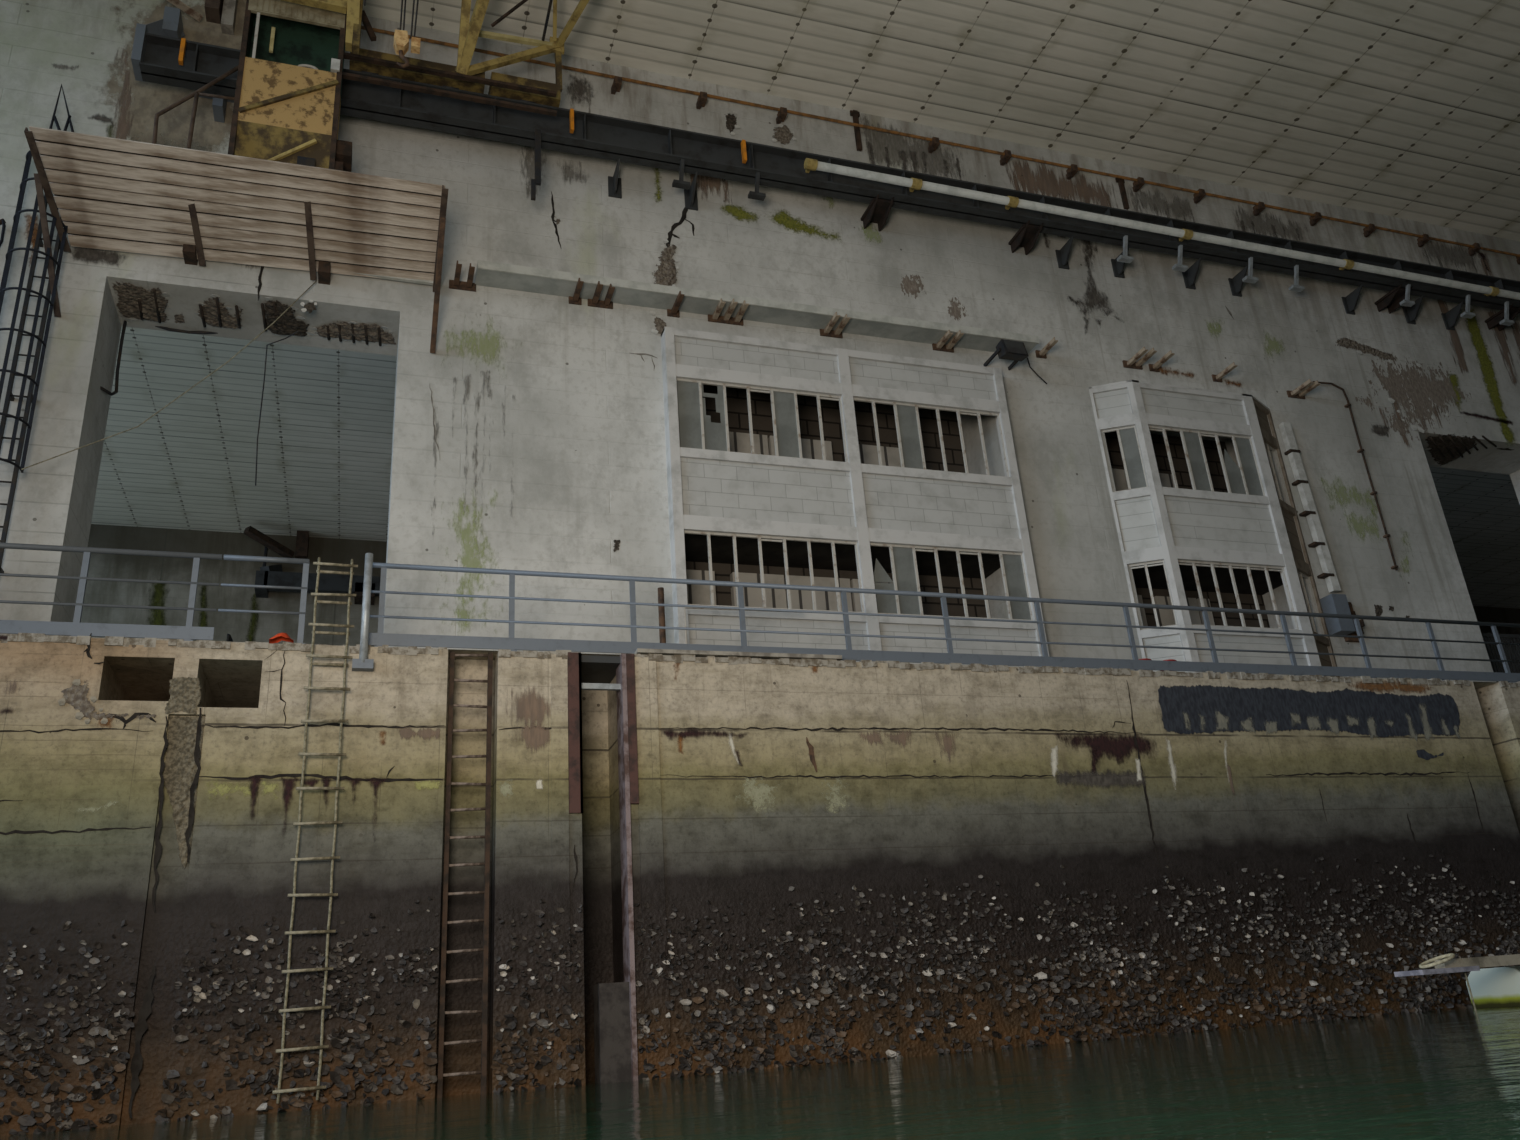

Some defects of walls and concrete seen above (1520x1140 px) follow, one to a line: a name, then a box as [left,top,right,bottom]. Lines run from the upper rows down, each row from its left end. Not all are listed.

crack [666,207,695,268]
peeling [1335,335,1497,466]
water stain [511,690,550,751]
spalling [58,677,205,869]
crack [0,650,444,911]
water stain [208,781,279,797]
corrosion [250,776,260,817]
corrosion [281,778,384,813]
water stain [664,729,776,812]
water stain [1051,733,1176,787]